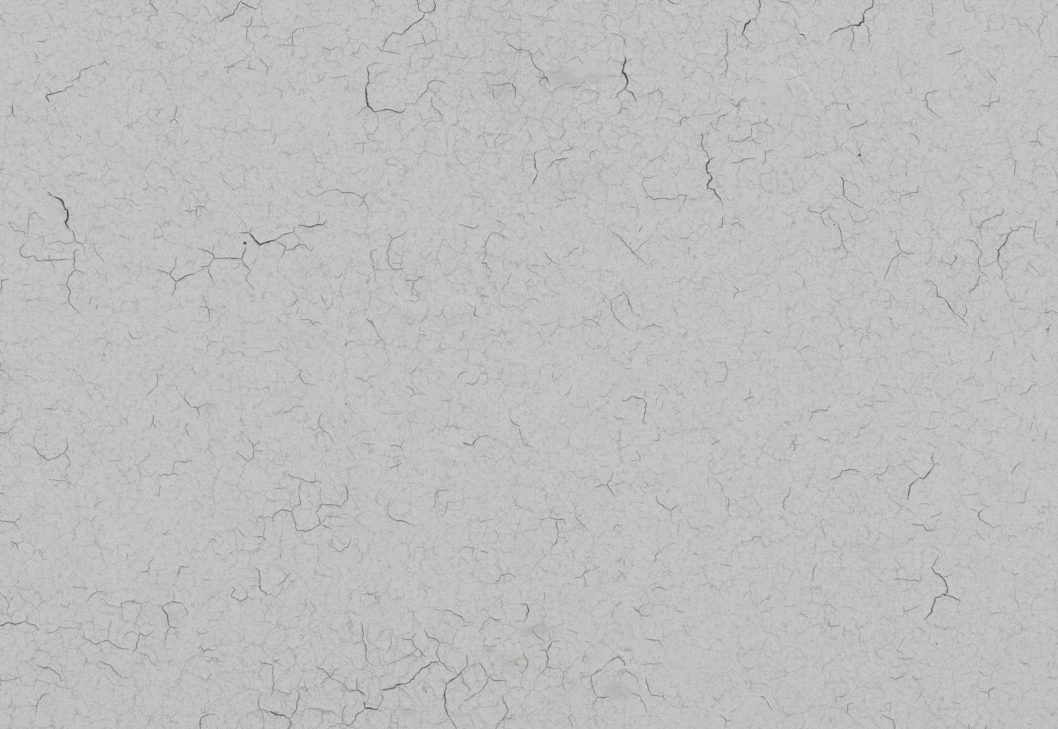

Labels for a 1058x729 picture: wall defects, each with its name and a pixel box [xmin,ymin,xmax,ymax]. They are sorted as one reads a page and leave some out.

crack [965,68,1001,113]
crack [803,87,942,288]
crack [1013,123,1058,194]
crack [0,0,875,520]
crack [882,238,915,304]
crack [922,192,1058,403]
crack [790,383,892,452]
crack [386,488,458,527]
crack [256,497,688,729]
crack [693,435,746,567]
crack [829,386,962,729]
crack [974,461,1046,541]